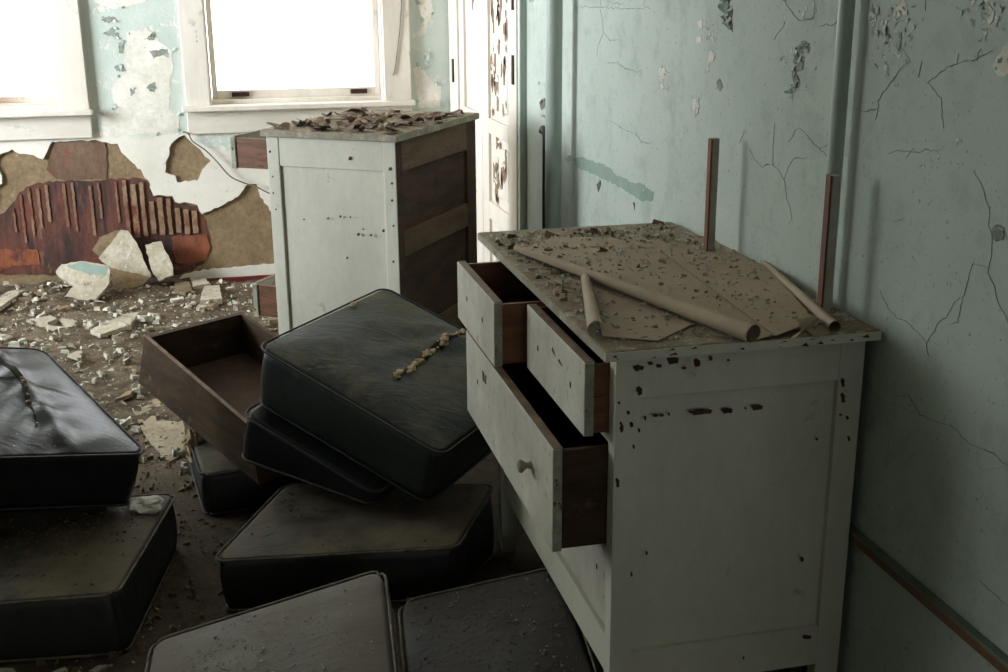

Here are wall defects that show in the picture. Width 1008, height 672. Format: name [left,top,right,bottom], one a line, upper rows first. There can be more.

spalling [0,0,277,285]
peeling [267,48,465,134]
peeling [490,0,508,116]
peeling [493,137,507,205]
peeling [696,0,733,91]
crack [740,125,828,219]
peeling [780,40,815,99]
peeling [867,0,916,87]
crack [861,33,991,158]
crack [880,170,1008,356]